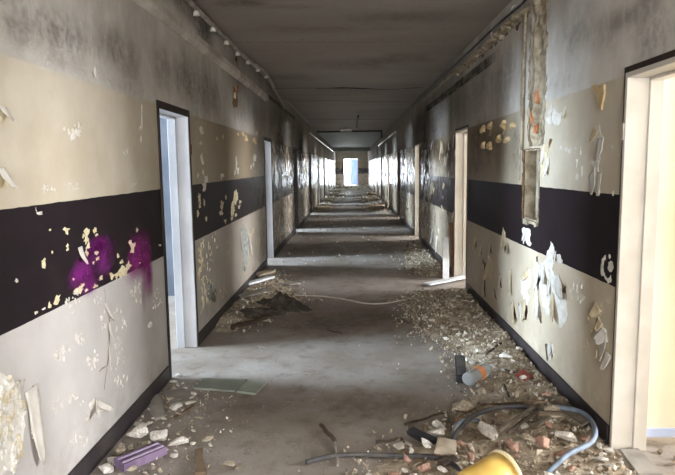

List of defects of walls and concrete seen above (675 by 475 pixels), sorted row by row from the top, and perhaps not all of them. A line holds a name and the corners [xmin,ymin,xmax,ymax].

flaking render [422,0,567,176]
peeling [592,83,606,110]
peeling [0,167,18,190]
peeling [197,154,208,221]
peeling [219,190,241,224]
peeling [559,125,604,196]
peeling [78,227,100,265]
peeling [72,253,141,296]
peeling [472,227,568,328]
crack [99,289,114,390]
peeling [588,298,611,370]
peeling [0,372,46,475]